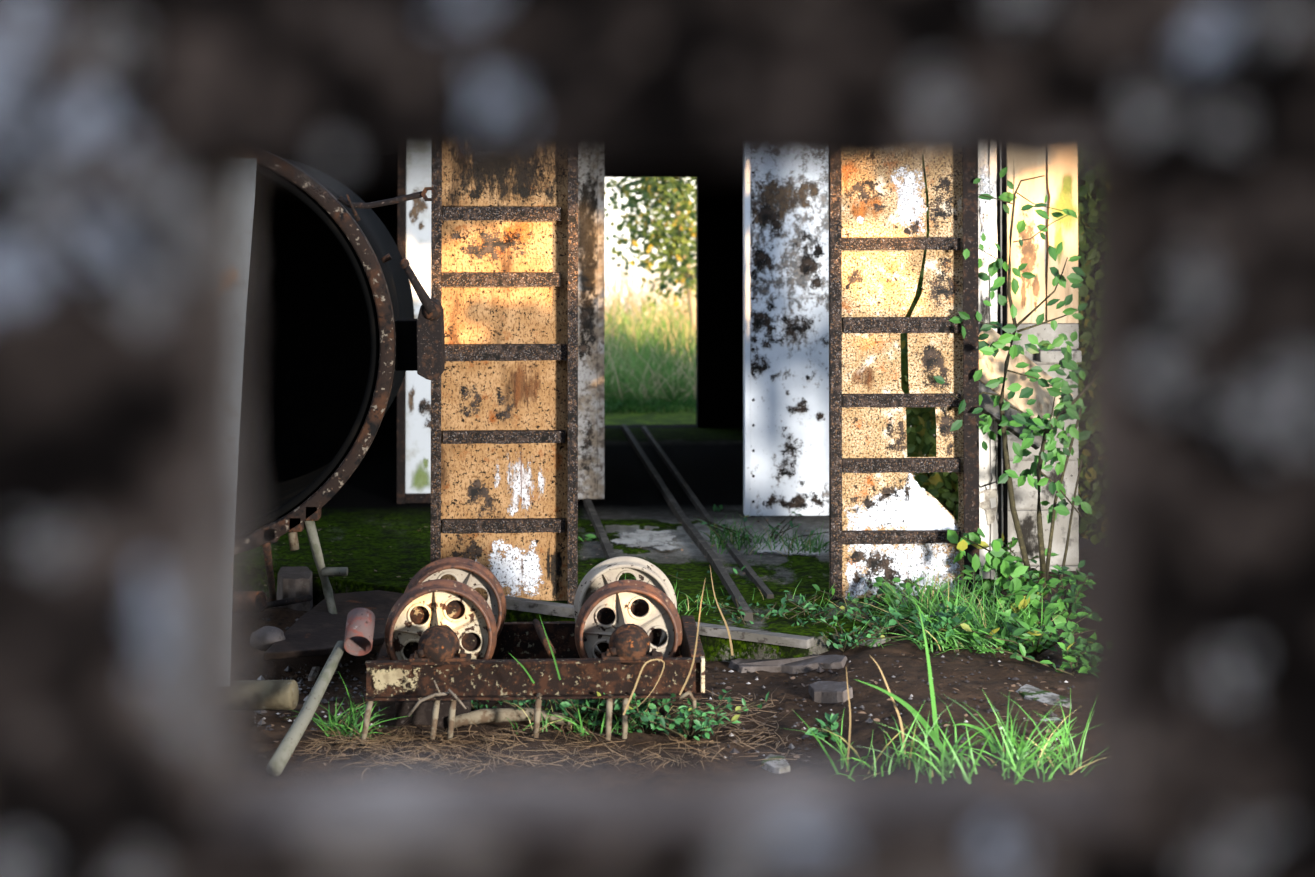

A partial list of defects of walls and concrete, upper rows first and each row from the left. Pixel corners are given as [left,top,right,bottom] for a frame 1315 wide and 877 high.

corrosion [854,197,882,218]
peeling [890,172,926,236]
corrosion [511,367,540,409]
corrosion [852,368,874,388]
peeling [494,458,545,516]
peeling [844,473,961,600]
peeling [476,539,543,597]